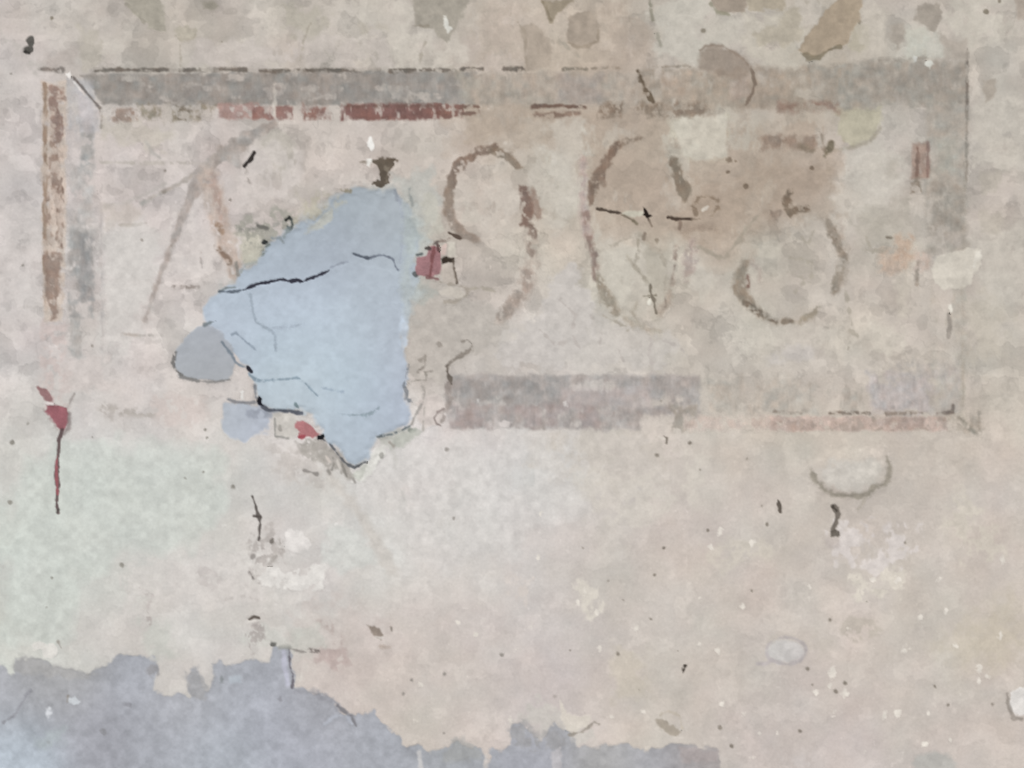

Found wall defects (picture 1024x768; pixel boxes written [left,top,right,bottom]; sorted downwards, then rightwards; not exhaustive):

peeling [695,0,864,84]
flaking render [35,385,76,437]
flaking render [170,183,446,484]
crack [217,252,400,470]
crack [247,494,285,581]
peeling [0,639,735,768]